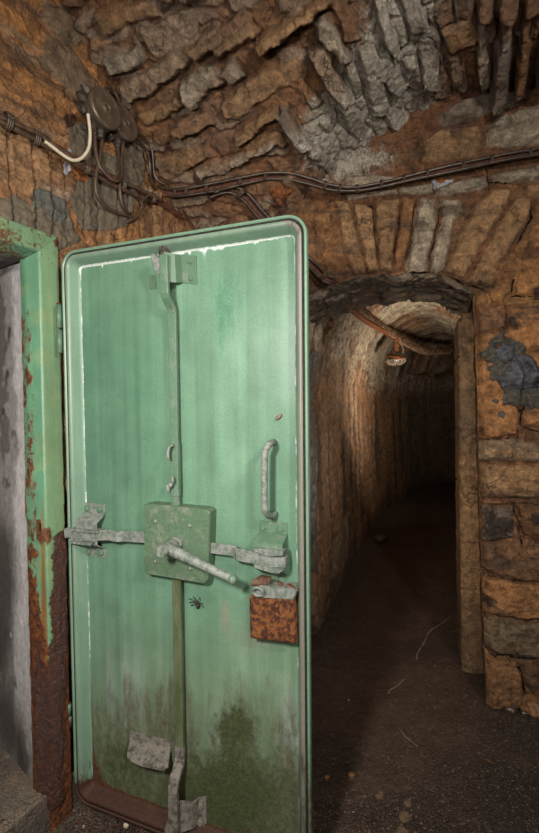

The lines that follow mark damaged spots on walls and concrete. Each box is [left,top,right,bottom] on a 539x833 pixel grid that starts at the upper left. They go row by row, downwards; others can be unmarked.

damp [0,535,11,668]
rust [32,527,69,812]